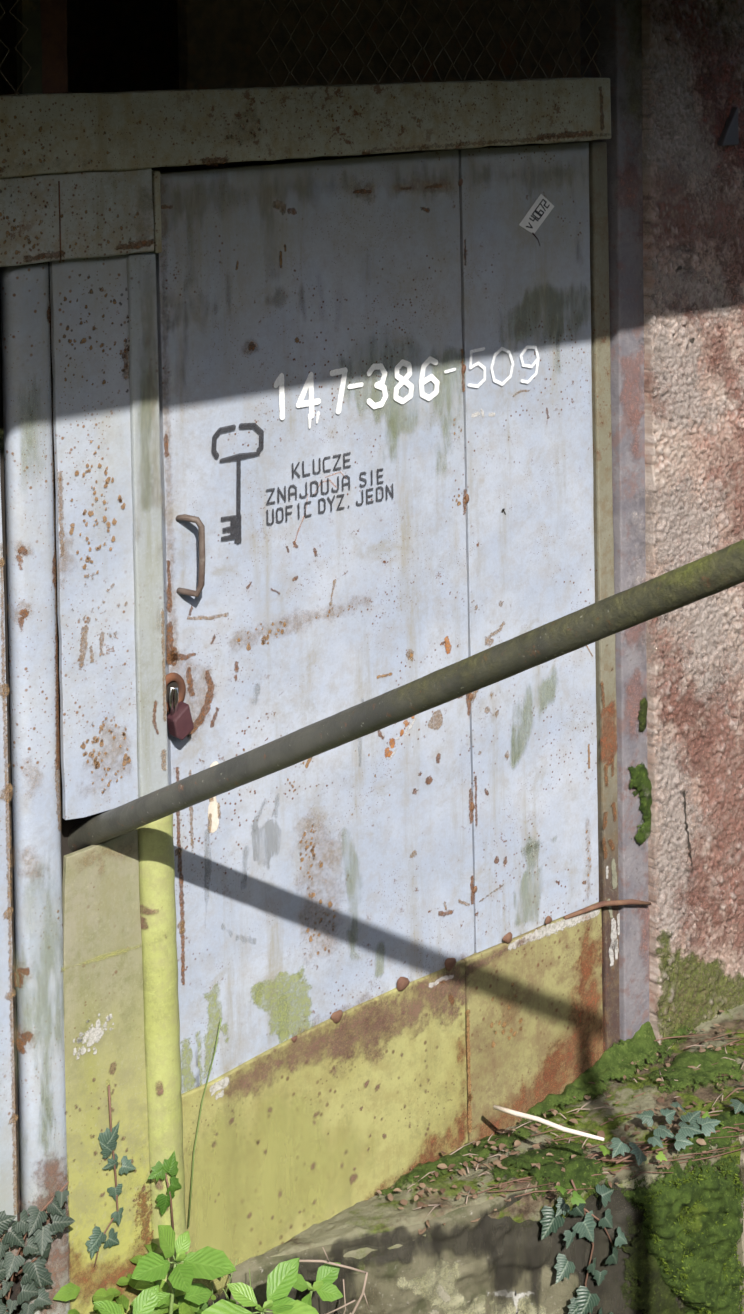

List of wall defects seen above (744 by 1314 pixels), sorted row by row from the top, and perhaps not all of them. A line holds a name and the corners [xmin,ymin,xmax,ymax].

corrosion [47,274,130,396]
corrosion [52,440,131,830]
corrosion [152,560,228,737]
corrosion [428,709,443,730]
corrosion [0,544,34,1215]
corrosion [299,825,336,955]
peeling [73,1013,114,1059]
corrosion [226,928,605,1174]
corrosion [0,1160,168,1314]
water stain [287,1178,648,1314]